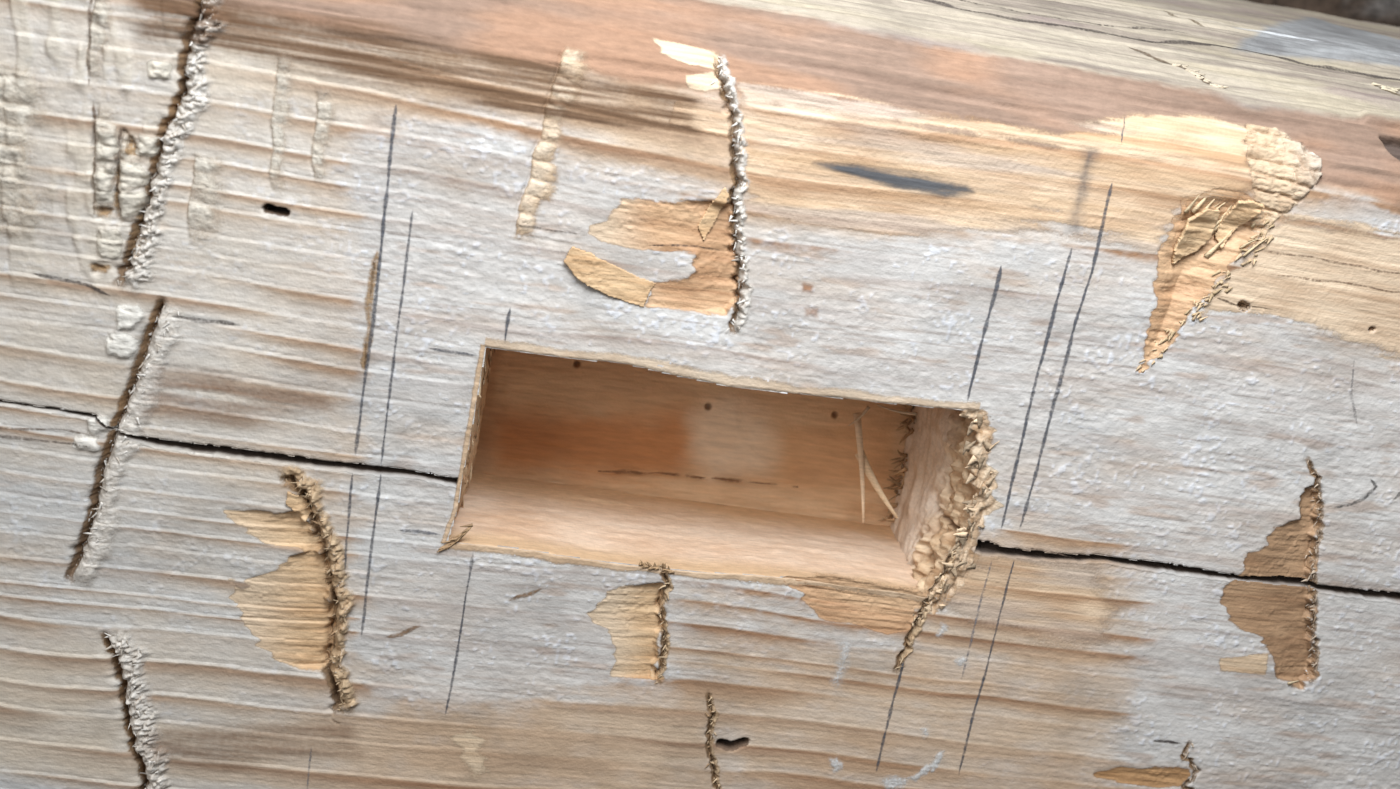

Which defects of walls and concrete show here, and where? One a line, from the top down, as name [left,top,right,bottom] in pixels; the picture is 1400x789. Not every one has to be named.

peeling [564,246,656,307]
crack [0,397,459,488]
crack [975,538,1400,604]
peeling [1219,654,1268,675]